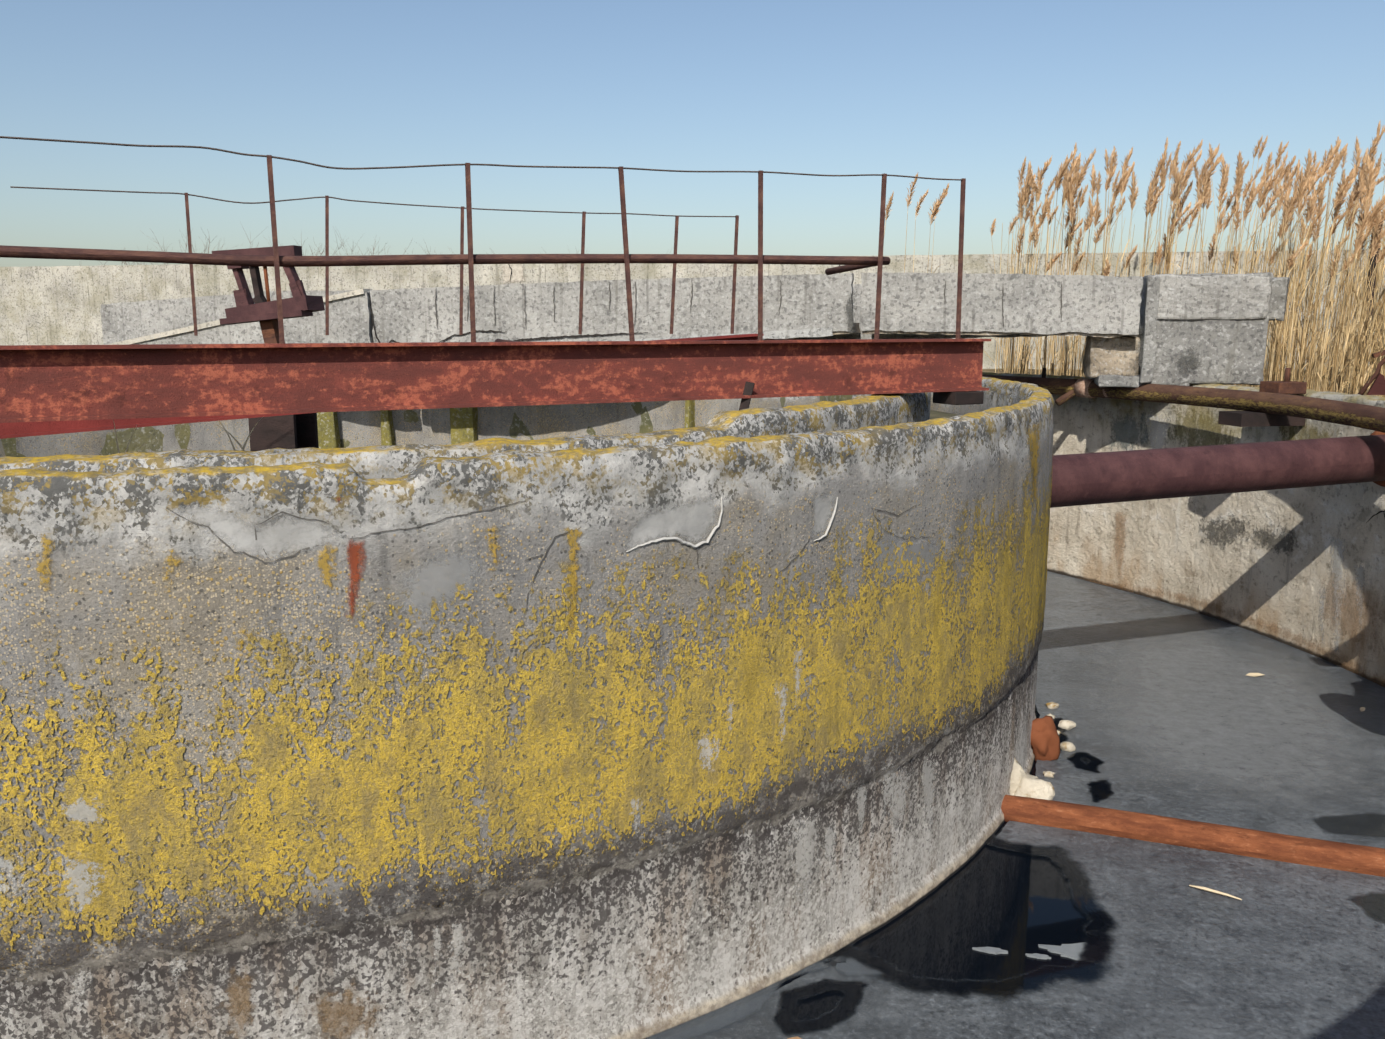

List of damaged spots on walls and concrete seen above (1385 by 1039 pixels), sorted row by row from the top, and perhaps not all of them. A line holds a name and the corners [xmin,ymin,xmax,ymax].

crack [166,501,526,564]
leakage [1200,516,1299,554]
rust [345,541,366,616]
leakage [61,797,104,822]
leakage [0,859,25,917]
leakage [59,857,106,911]
leakage [434,924,465,983]
leakage [70,968,91,1006]
leakage [317,989,379,1039]